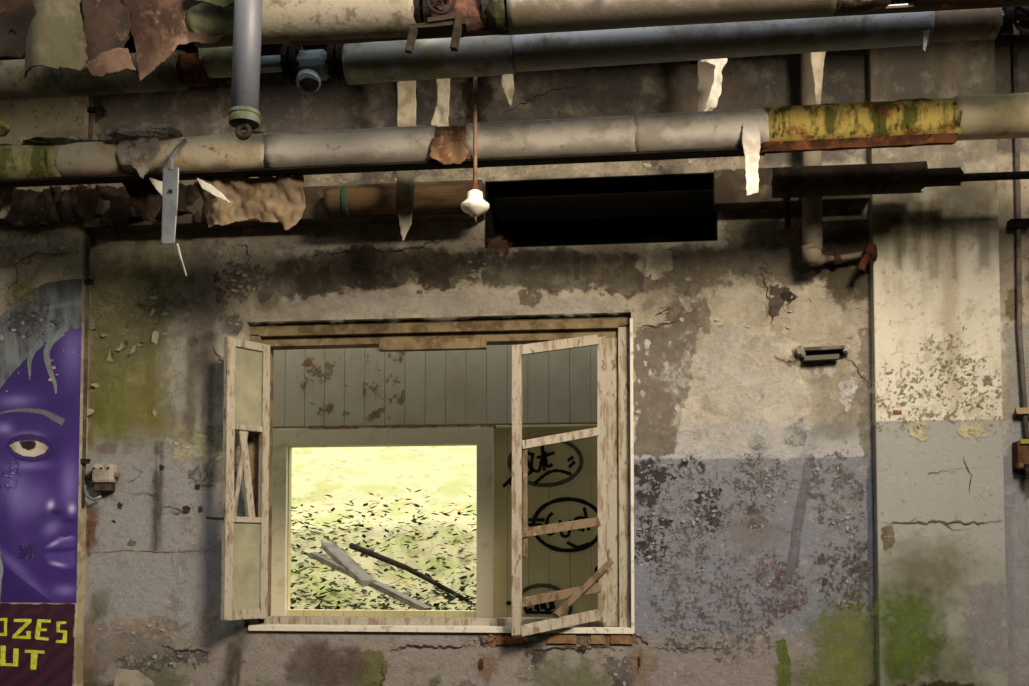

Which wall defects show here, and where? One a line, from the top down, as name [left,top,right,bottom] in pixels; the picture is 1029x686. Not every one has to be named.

rust [759,133,959,154]
water stain [259,206,870,318]
water stain [166,311,224,427]
peeling [301,357,335,390]
peeling [362,349,406,421]
peeling [627,244,1011,668]
crack [883,517,1001,530]
spalling [547,633,644,686]